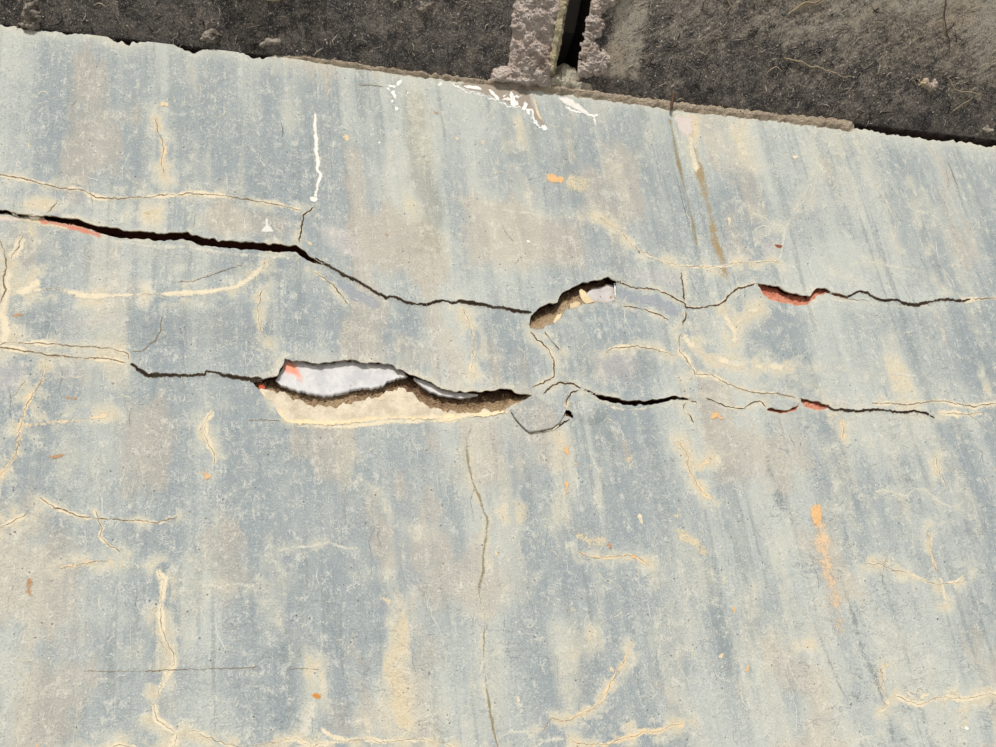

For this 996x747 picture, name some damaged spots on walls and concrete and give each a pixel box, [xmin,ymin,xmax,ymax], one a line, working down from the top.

crack [0,172,795,423]
flaking render [529,276,680,330]
flaking render [756,282,847,306]
crack [830,290,996,308]
flaking render [253,358,573,434]
flaking render [767,398,828,414]
crack [827,397,996,421]
crack [465,426,499,747]